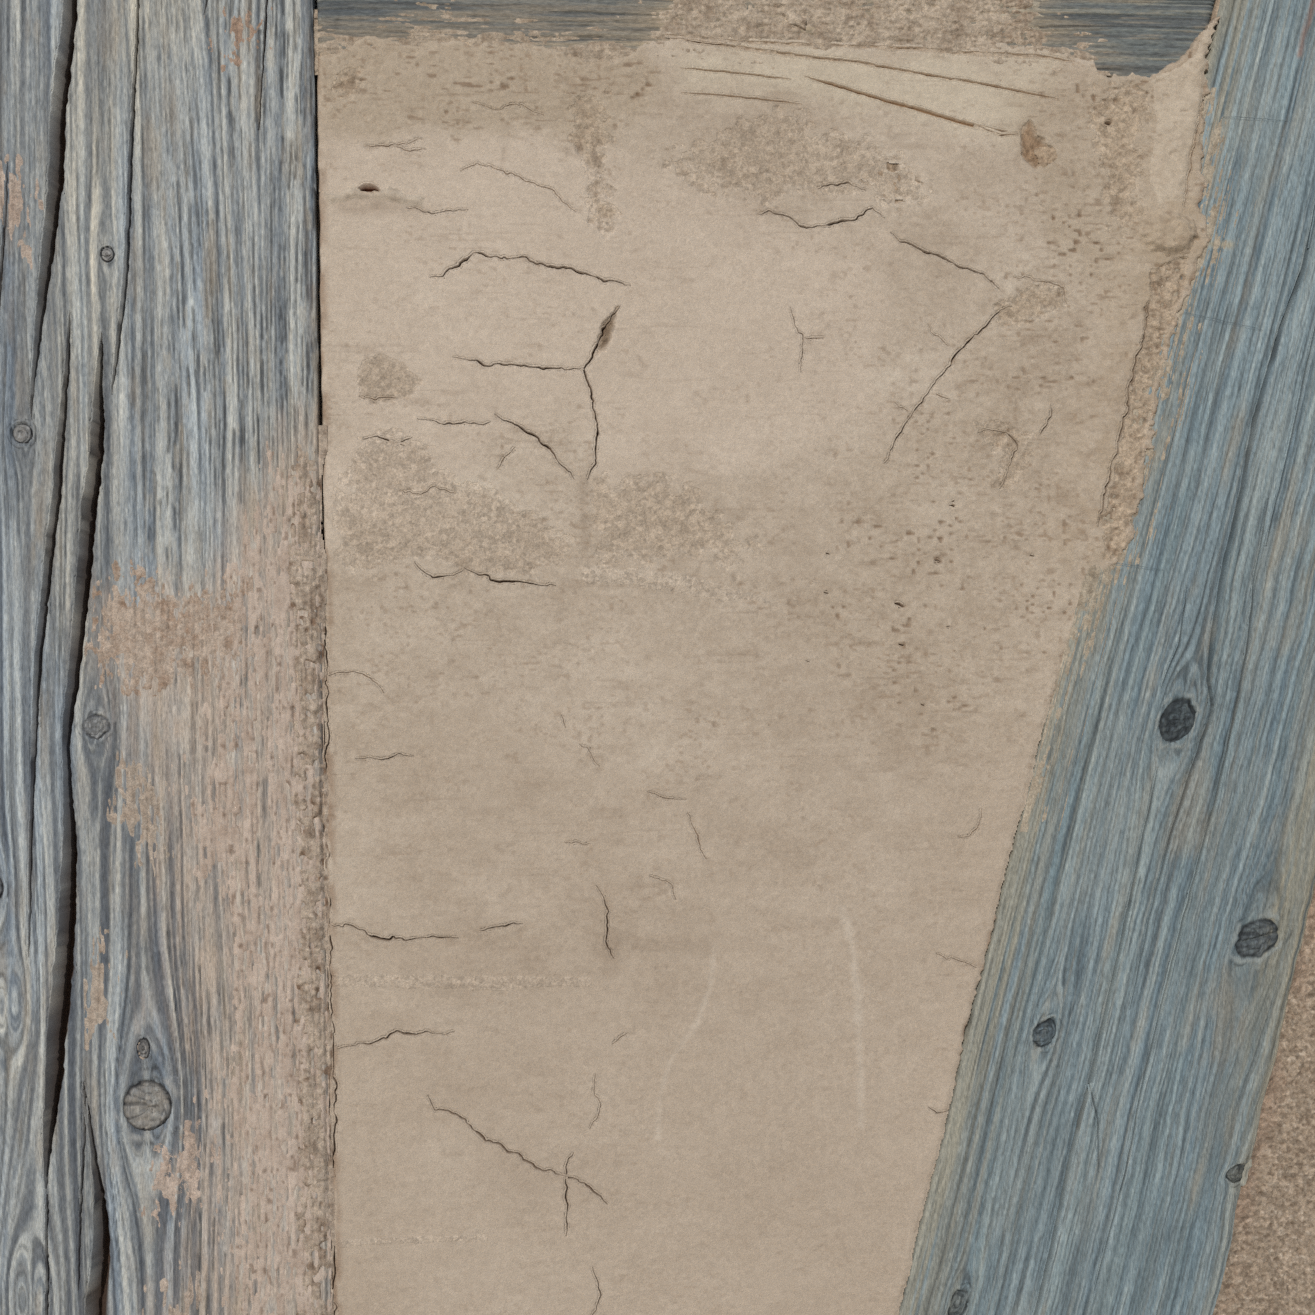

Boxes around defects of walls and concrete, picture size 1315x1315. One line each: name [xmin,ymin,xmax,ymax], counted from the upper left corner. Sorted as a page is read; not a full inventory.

crack [406,207,469,216]
crack [460,161,576,213]
spalling [1019,119,1058,170]
spalling [1089,81,1156,245]
crack [358,251,631,481]
crack [757,180,1068,465]
spalling [973,420,1036,511]
spalling [1098,257,1189,562]
crack [322,604,523,1315]
crack [427,1073,608,1236]